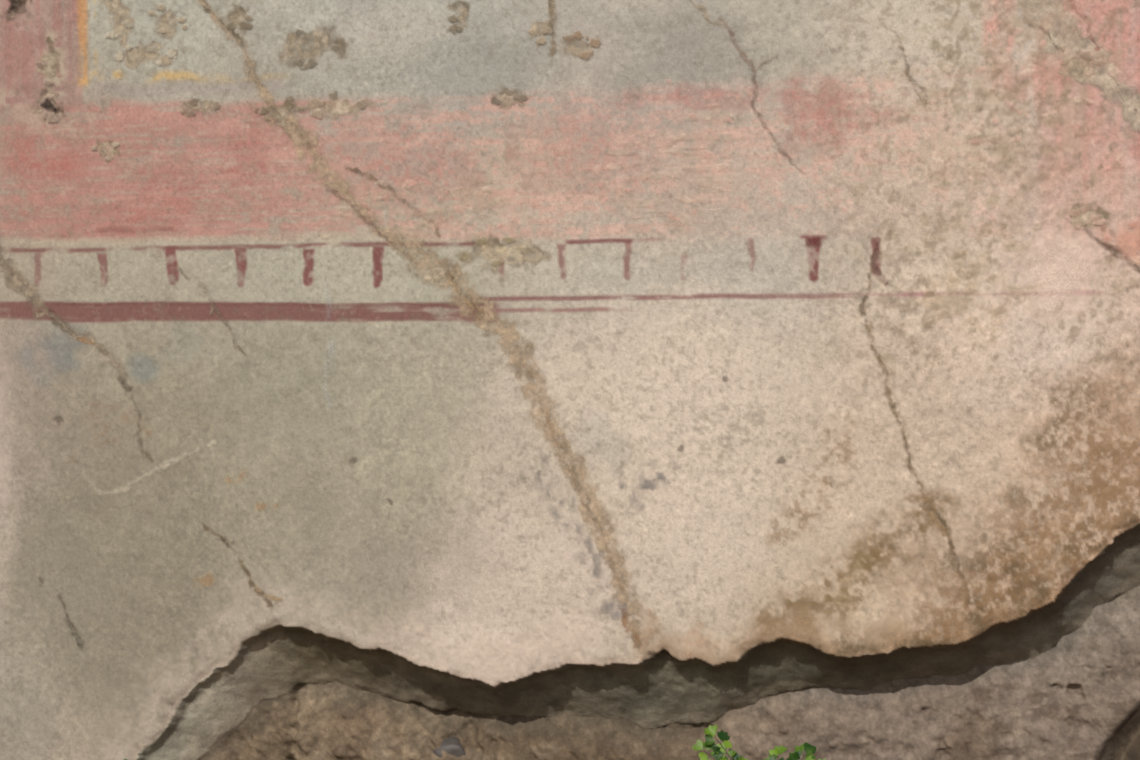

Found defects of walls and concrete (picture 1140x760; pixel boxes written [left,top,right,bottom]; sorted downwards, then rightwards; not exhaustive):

spalling [6,0,31,21]
spalling [32,37,63,123]
spalling [105,0,187,68]
spalling [180,98,220,116]
spalling [226,4,253,33]
spalling [279,28,347,69]
spalling [254,92,372,126]
crack [697,5,793,164]
crack [0,246,152,460]
crack [199,0,671,656]
crack [860,244,967,587]
leakage [745,379,1140,657]